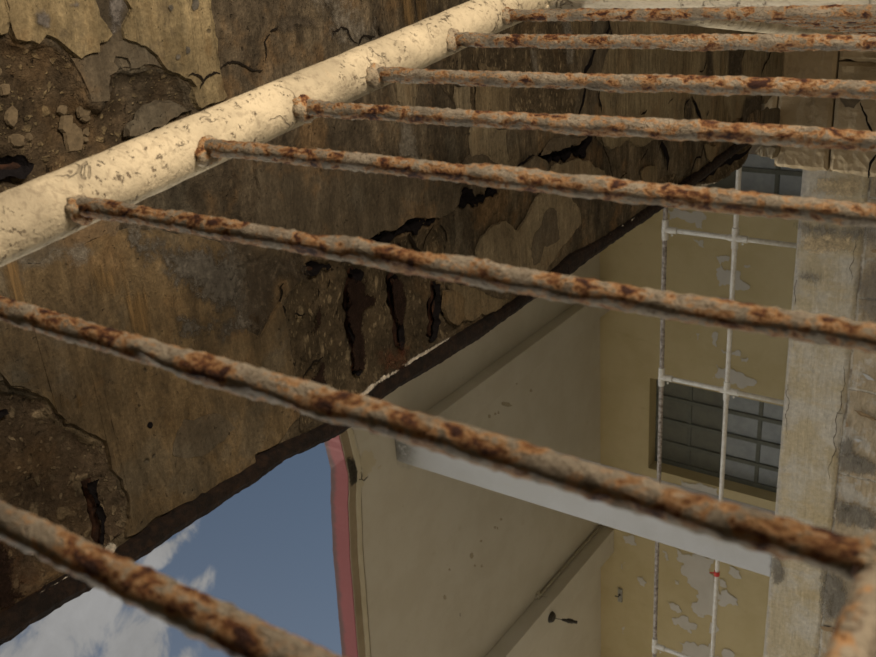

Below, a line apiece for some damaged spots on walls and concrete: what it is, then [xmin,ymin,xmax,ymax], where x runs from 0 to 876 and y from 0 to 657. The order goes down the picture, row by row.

crack [189,26,278,89]
crack [332,26,383,44]
peeling [442,47,784,78]
spalling [0,0,227,193]
peeling [439,84,780,125]
spalling [462,127,662,176]
peeling [252,160,497,254]
peeling [475,192,581,271]
spalling [285,258,510,394]
corrosion [311,362,328,385]
spalling [0,383,127,548]
corrosion [0,543,25,610]